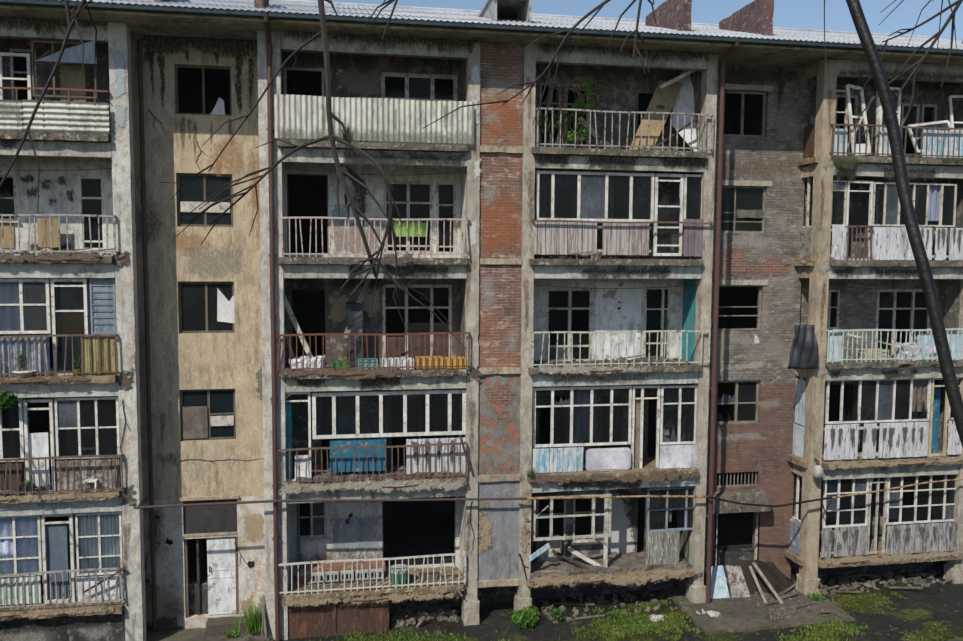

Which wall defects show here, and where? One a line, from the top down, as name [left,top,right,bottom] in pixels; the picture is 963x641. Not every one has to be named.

water stain [141,34,257,135]
water stain [180,118,197,151]
spalling [720,247,791,278]
flaking render [467,365,517,424]
crack [180,457,263,465]
peeling [412,440,455,465]
spalling [279,476,464,495]
peeling [243,514,264,542]